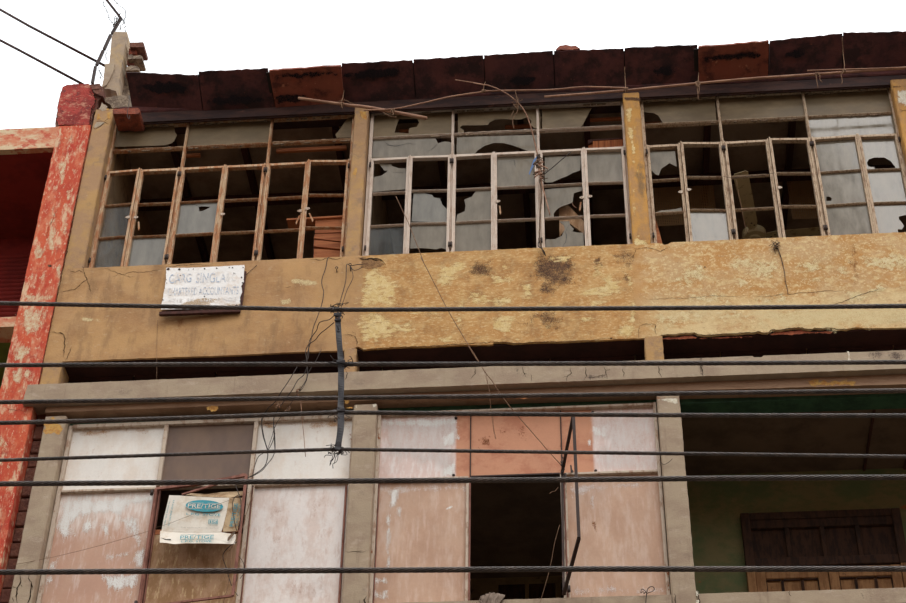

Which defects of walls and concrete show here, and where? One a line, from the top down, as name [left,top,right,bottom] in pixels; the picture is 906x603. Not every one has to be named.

peeling [18,265,61,335]
peeling [35,218,68,258]
crack [40,159,194,377]
damp [516,253,581,332]
peeling [10,344,33,382]
peeling [43,417,63,435]